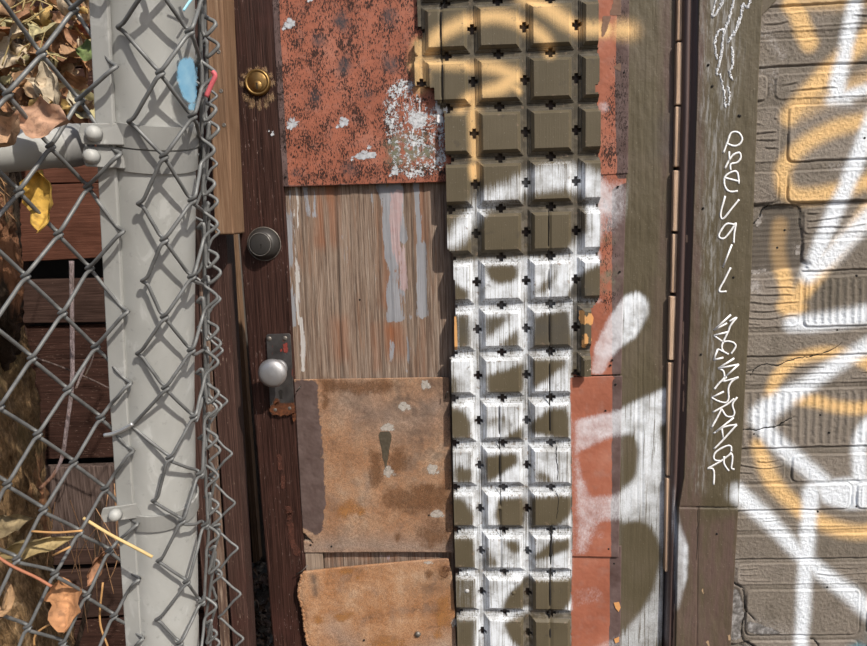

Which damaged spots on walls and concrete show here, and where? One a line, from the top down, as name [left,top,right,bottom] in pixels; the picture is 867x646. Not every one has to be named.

peeling [382,79,446,179]
crack [746,343,841,375]
corrosion [269,398,296,422]
crack [743,418,792,431]
spalling [731,589,780,646]